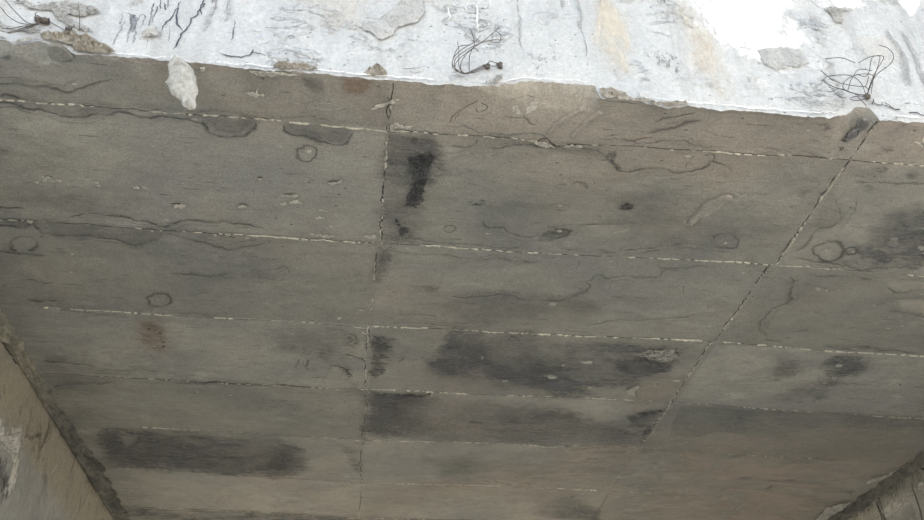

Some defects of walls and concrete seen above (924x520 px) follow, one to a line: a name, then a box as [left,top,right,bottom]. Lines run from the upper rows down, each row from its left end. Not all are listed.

crack [162,0,205,48]
crack [220,18,295,64]
crack [872,99,924,116]
crack [631,113,737,166]
water stain [386,135,444,208]
water stain [798,210,924,280]
water stain [368,336,406,380]
water stain [413,314,679,396]
water stain [364,392,666,451]
water stain [99,429,307,476]